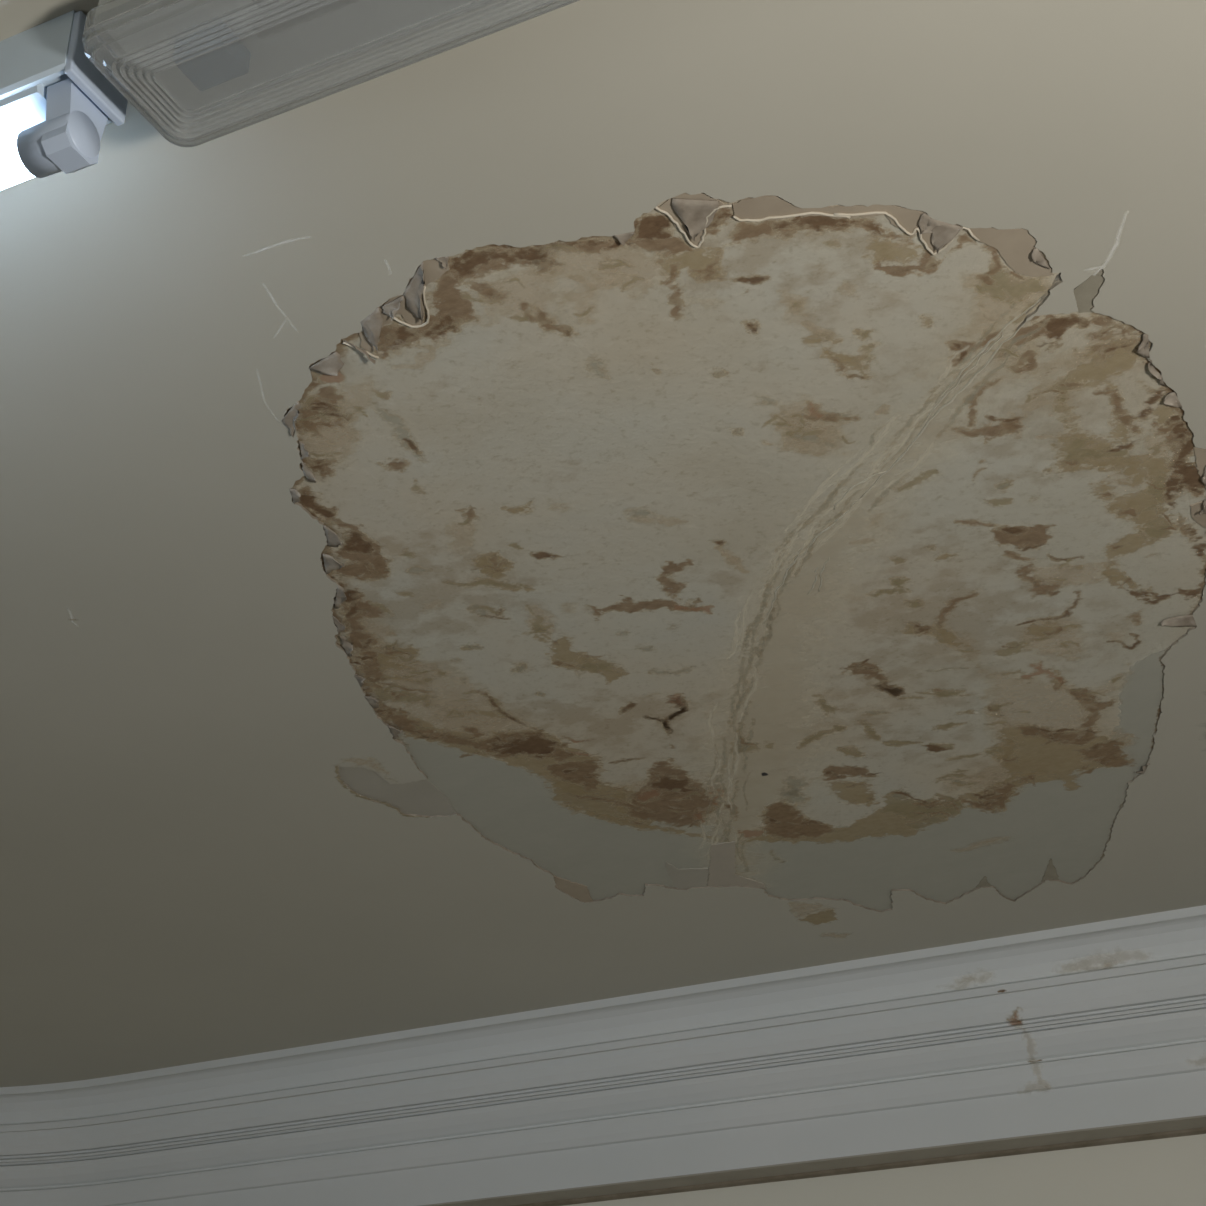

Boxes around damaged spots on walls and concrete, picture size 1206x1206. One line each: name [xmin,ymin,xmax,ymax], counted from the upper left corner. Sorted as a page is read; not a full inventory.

leakage [374,208,941,359]
leakage [285,329,1134,844]
peeling [282,193,1206,911]
crack [712,298,1041,874]
leakage [946,234,1206,650]